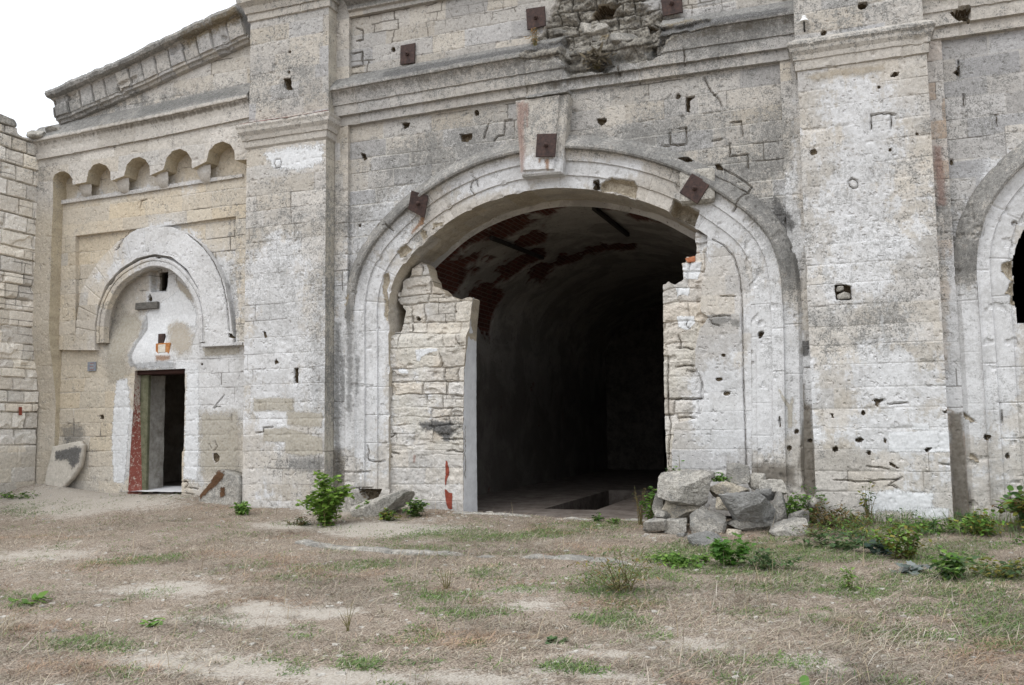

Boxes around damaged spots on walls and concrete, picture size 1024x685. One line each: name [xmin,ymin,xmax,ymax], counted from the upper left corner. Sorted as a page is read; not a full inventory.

spalling [519,0,705,80]
water stain [420,420,453,441]
water stain [950,412,968,518]